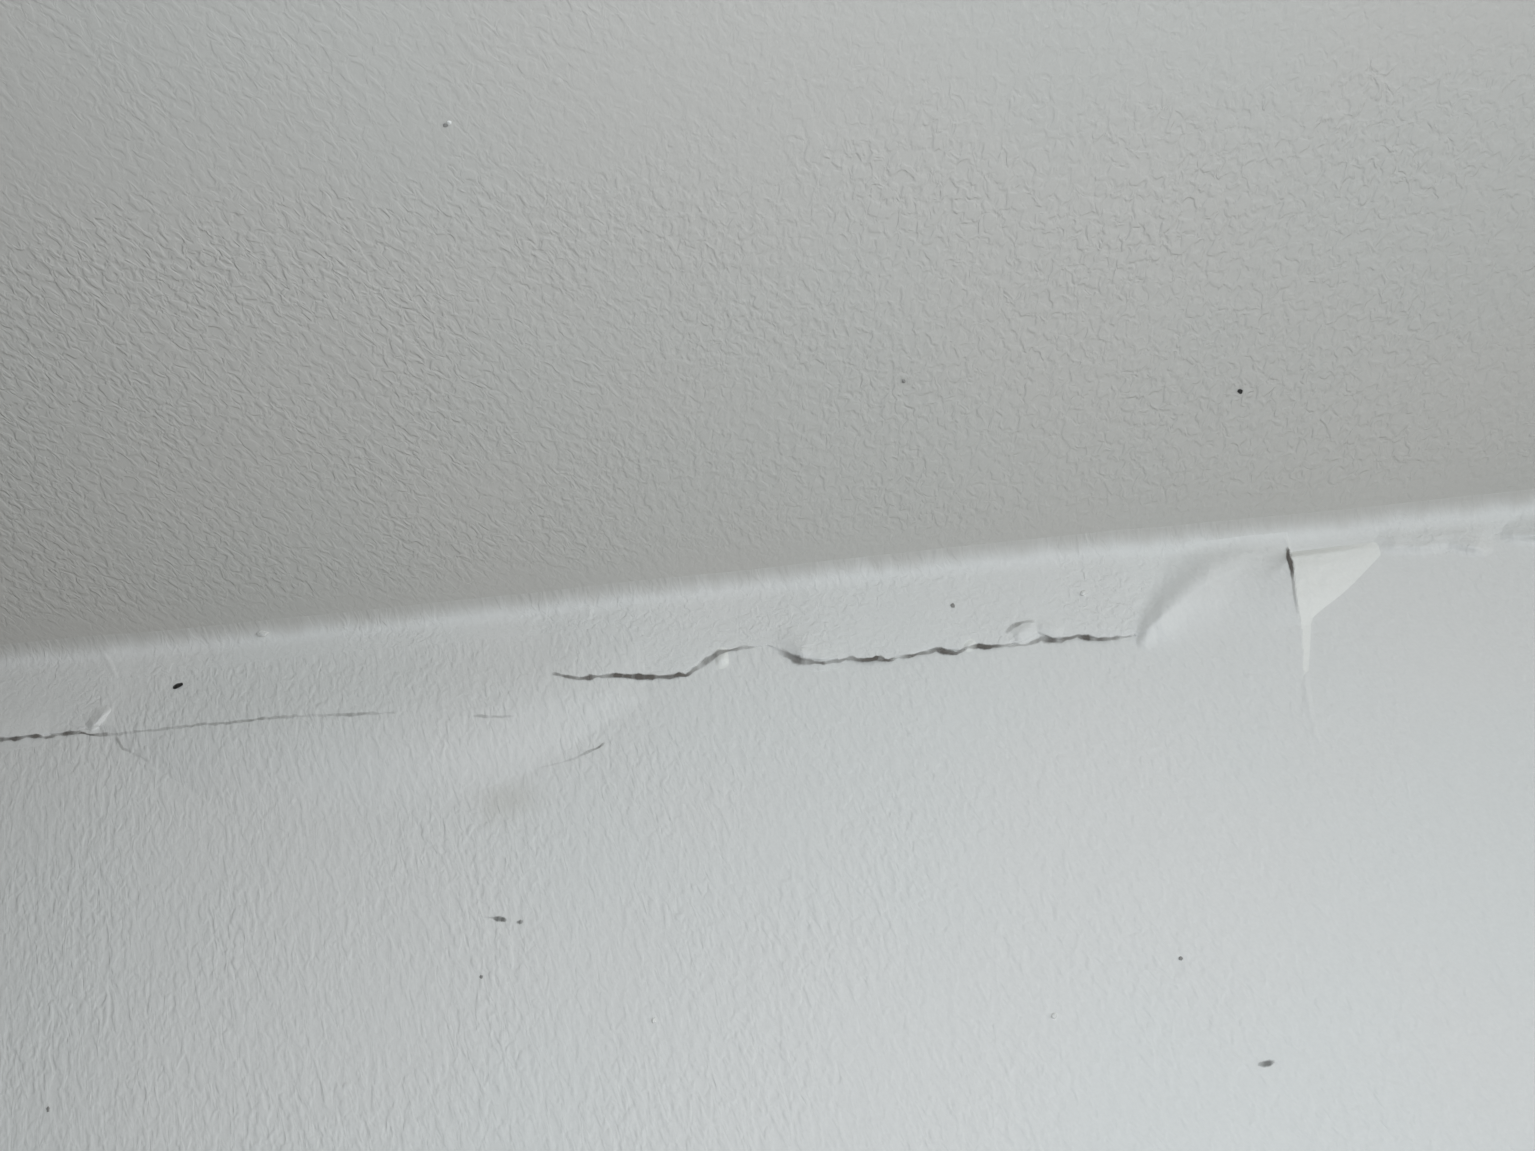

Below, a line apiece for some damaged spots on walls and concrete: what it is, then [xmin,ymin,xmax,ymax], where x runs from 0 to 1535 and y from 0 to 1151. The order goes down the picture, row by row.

crack [563,647,729,680]
crack [772,616,1104,672]
crack [0,681,94,751]